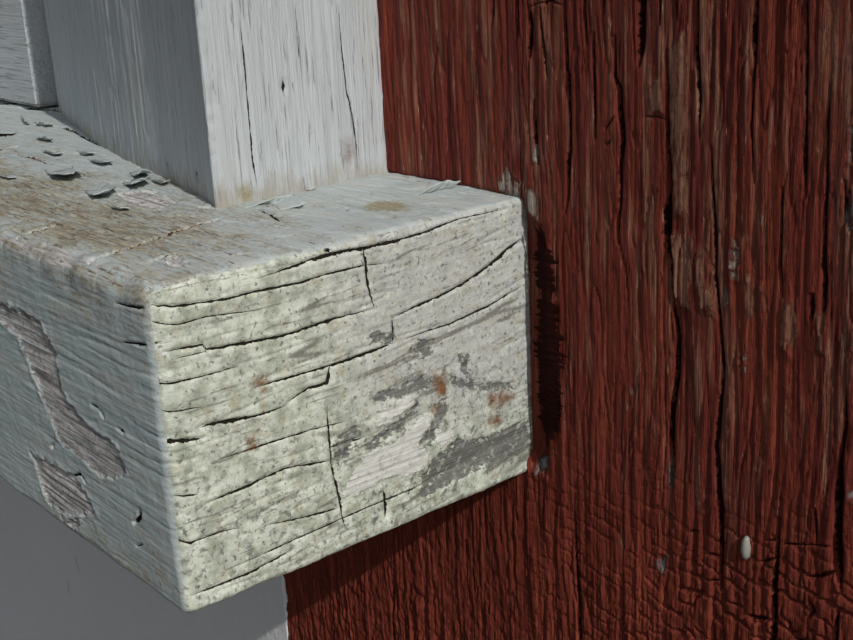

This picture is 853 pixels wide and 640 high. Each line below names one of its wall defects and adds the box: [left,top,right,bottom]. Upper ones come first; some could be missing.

peeling [35,121,64,155]
peeling [45,167,83,175]
peeling [85,176,177,210]
peeling [0,302,125,480]
crack [115,209,520,444]
crack [707,147,780,640]
peeling [34,456,95,532]
crack [175,412,421,595]